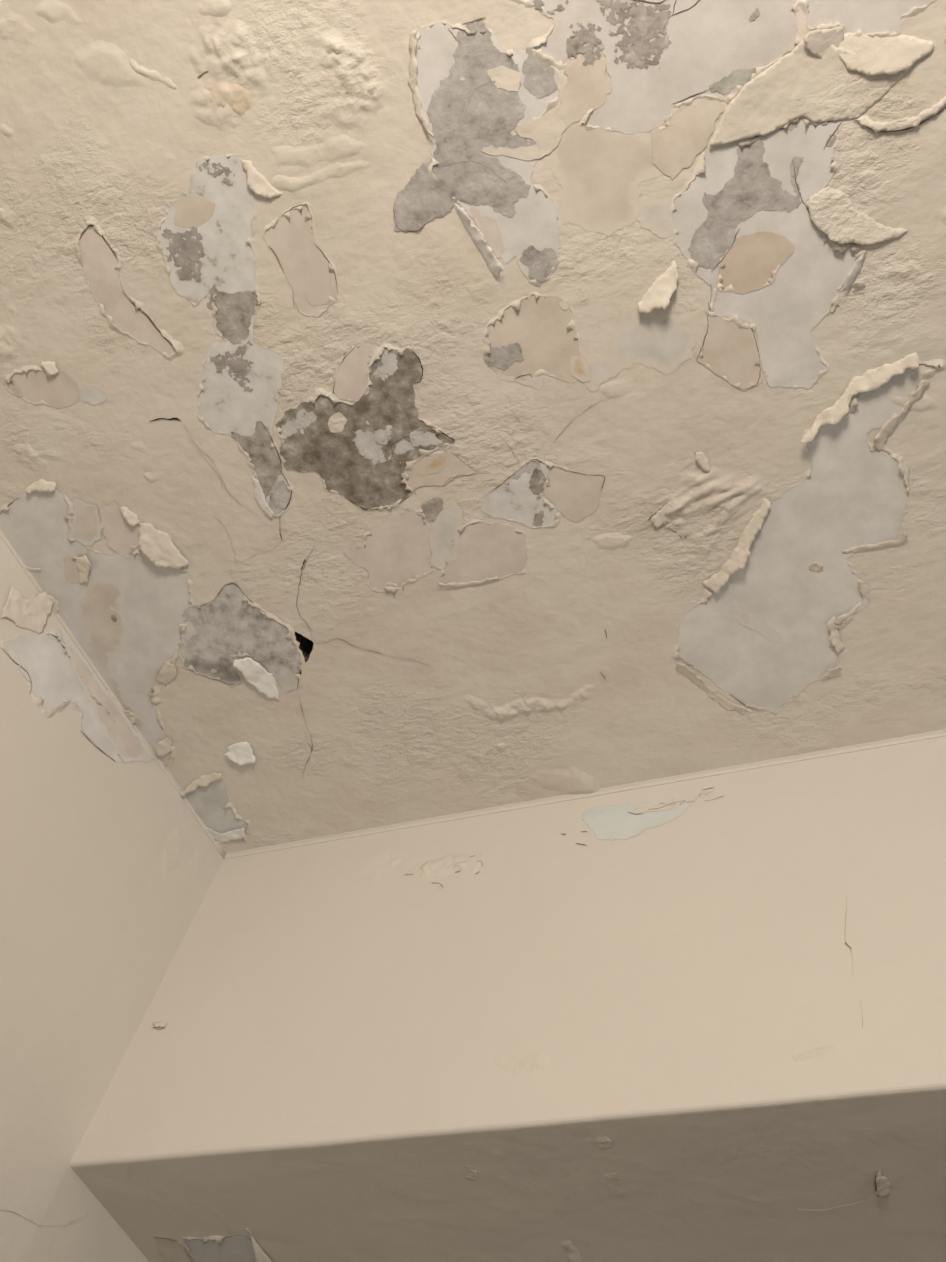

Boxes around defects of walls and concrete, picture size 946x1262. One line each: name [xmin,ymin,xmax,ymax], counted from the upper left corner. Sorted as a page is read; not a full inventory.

peeling [74,215,185,361]
flaking render [155,154,456,519]
flaking render [393,0,946,392]
peeling [0,479,314,770]
flaking render [480,457,608,529]
peeling [671,352,946,716]
peeling [179,773,251,844]
peeling [153,1228,272,1262]